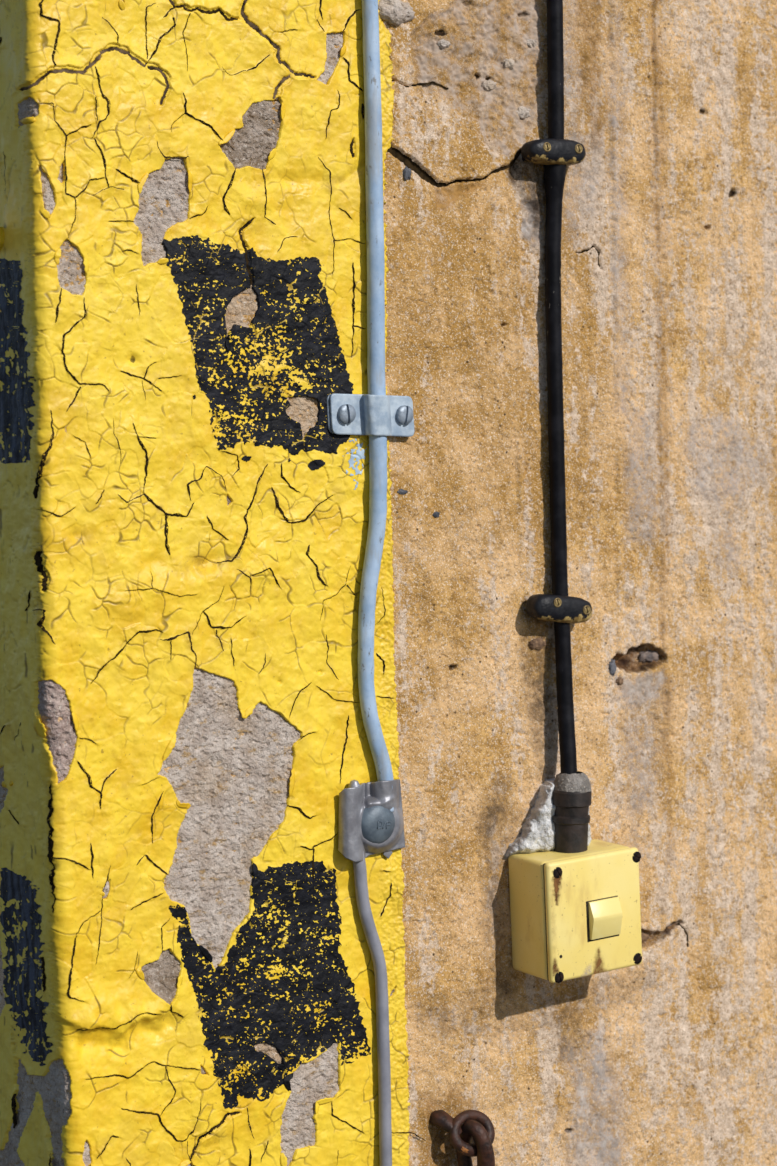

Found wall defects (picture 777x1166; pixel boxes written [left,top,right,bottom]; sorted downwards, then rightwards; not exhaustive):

peeling [133,157,193,266]
crack [19,0,365,353]
peeling [218,100,285,170]
crack [387,145,521,187]
crack [33,288,390,783]
crack [24,551,56,645]
spalling [608,645,665,704]
peeling [33,680,79,783]
peeling [158,667,301,968]
crack [40,779,183,1031]
crack [86,1061,269,1166]
peeling [254,1042,339,1166]